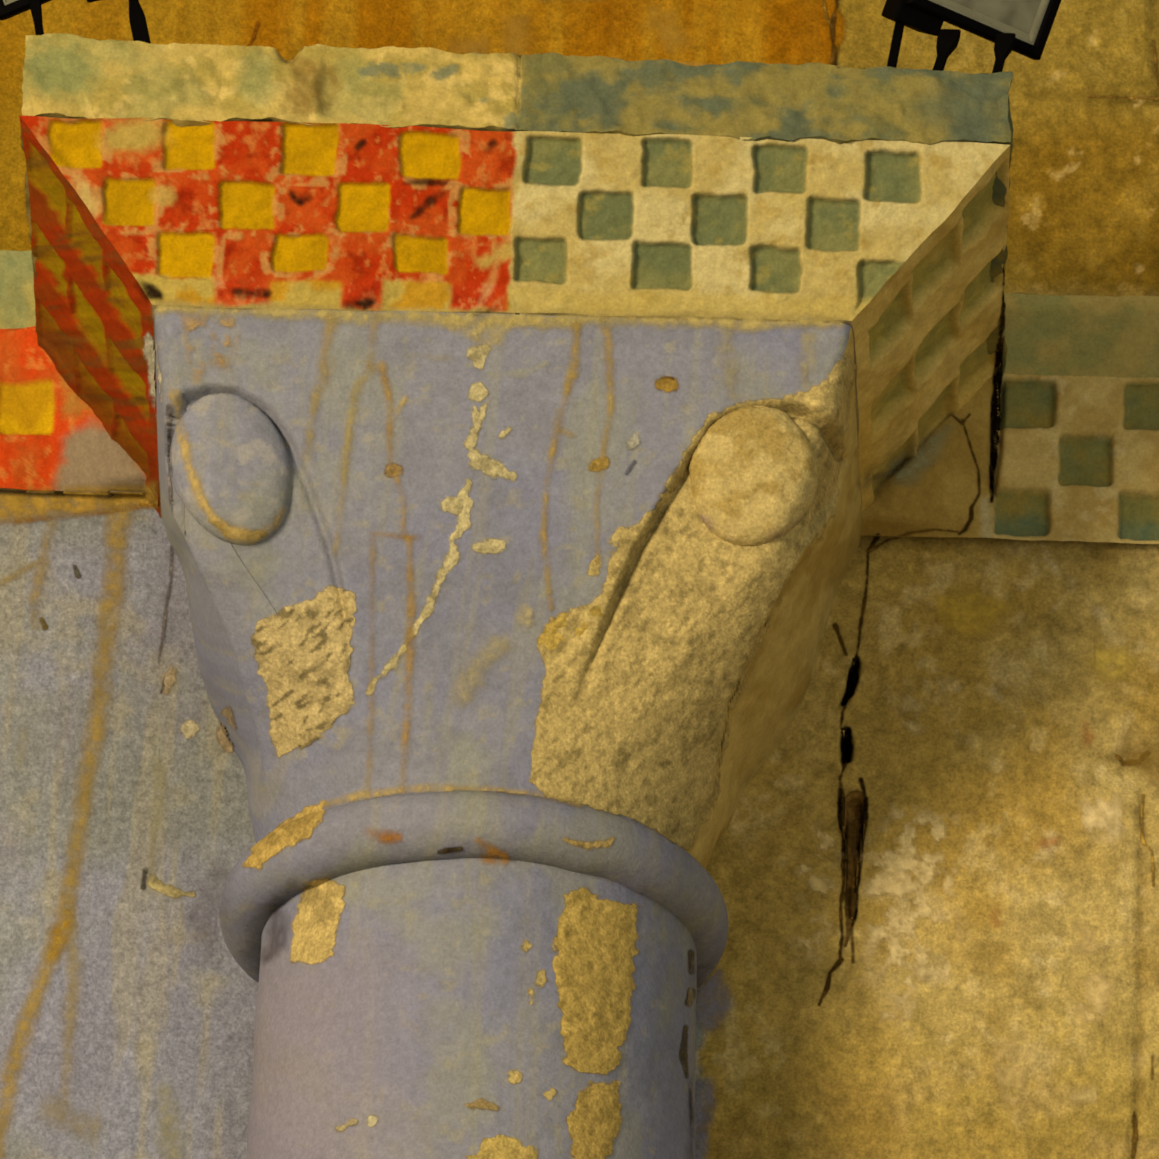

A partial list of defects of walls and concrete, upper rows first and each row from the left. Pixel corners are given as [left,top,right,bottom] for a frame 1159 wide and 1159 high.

peeling [251,344,517,758]
peeling [481,352,857,850]
crack [818,269,1006,1006]
peeling [290,879,345,964]
peeling [242,786,429,869]
peeling [467,1134,538,1159]
peeling [508,1070,522,1084]
peeling [528,887,639,1159]